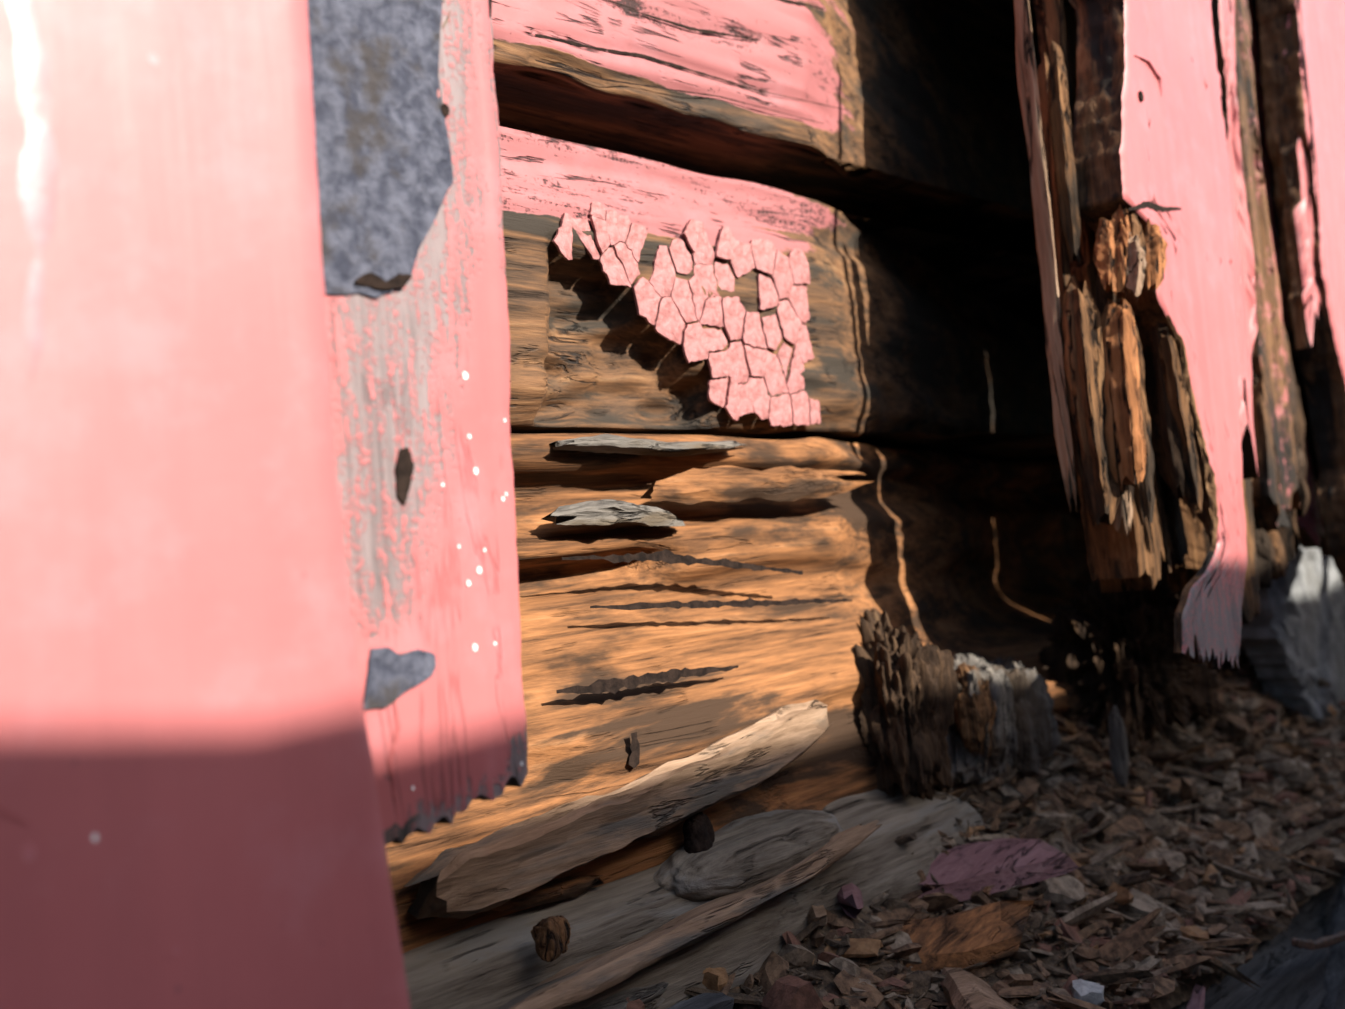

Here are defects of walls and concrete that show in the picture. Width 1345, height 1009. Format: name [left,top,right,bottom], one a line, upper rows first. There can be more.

peeling [307,0,453,298]
peeling [552,201,821,427]
peeling [363,647,437,710]